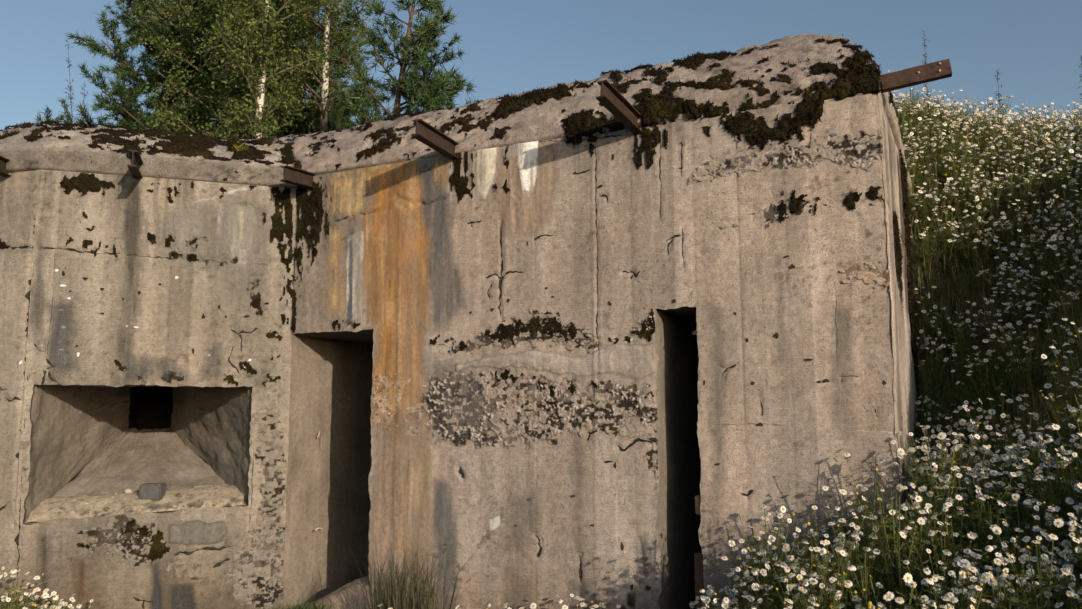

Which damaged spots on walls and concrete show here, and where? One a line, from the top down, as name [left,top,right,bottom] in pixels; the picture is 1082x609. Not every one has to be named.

crack [467,219,523,315]
rust [328,160,430,578]
spalling [371,366,658,480]
spalling [434,308,603,355]
spalling [78,514,166,566]
spalling [227,407,288,609]